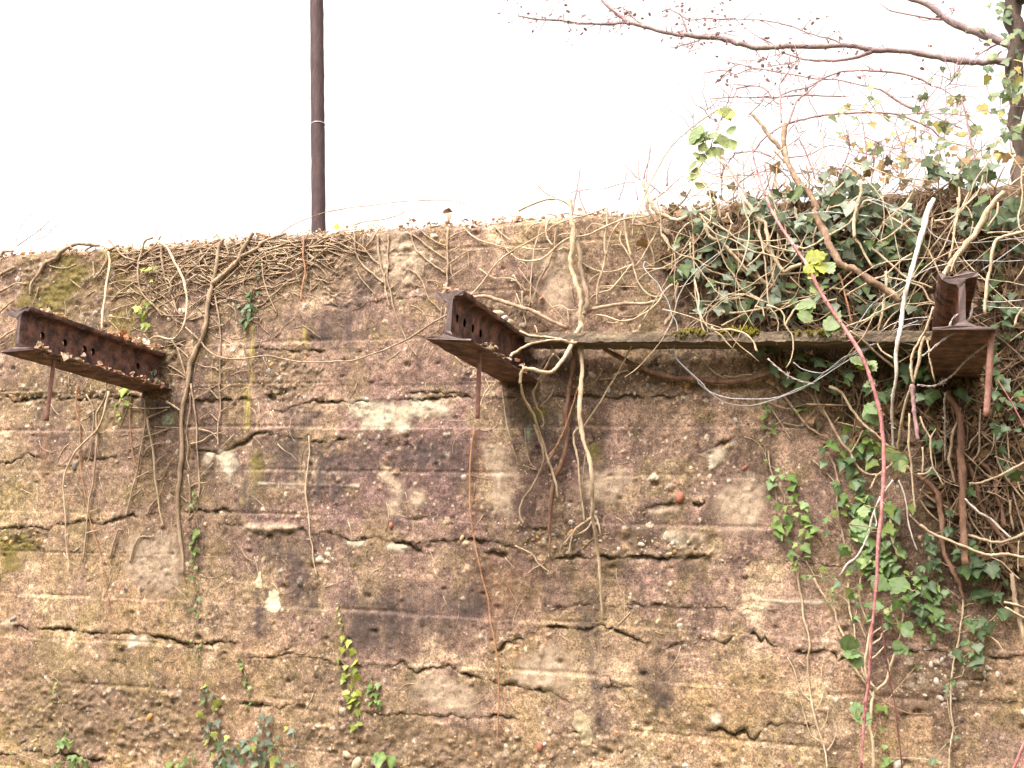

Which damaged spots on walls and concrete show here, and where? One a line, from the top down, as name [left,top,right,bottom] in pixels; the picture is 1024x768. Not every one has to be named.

crack [13,601,845,734]
crack [908,645,950,654]